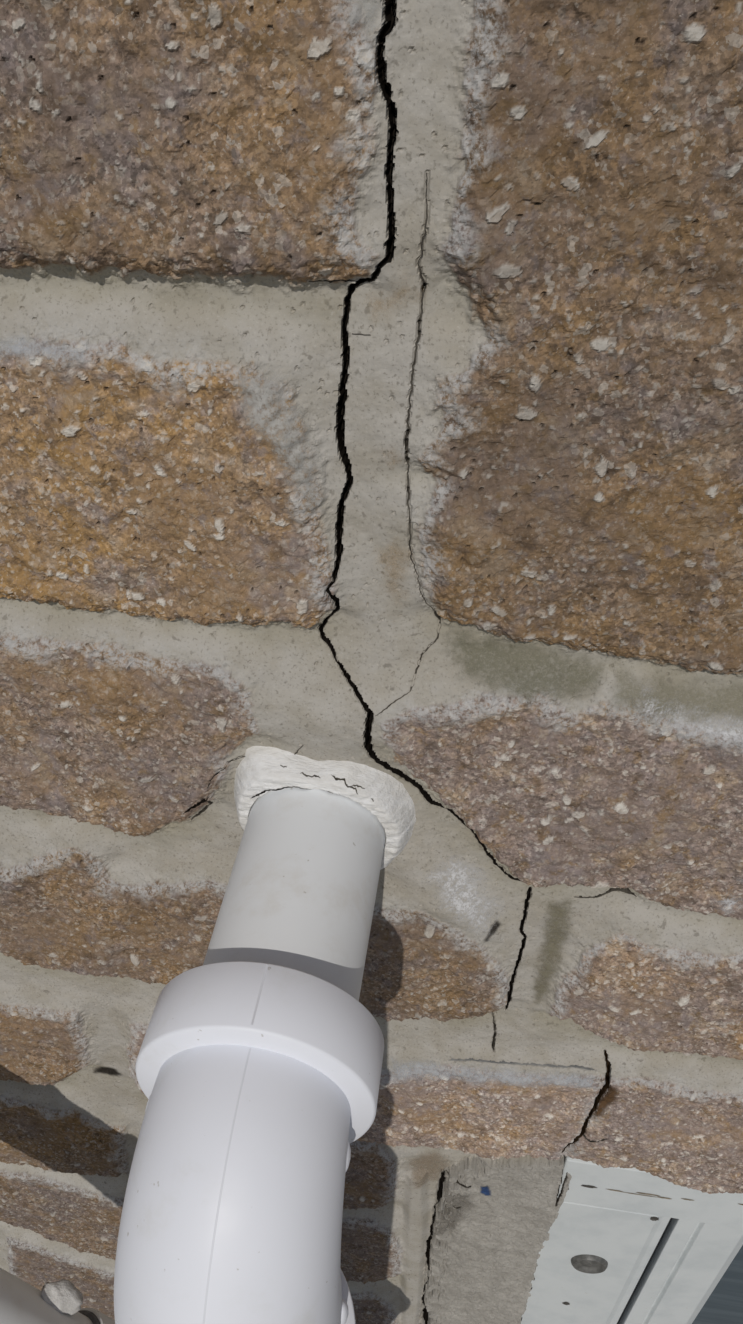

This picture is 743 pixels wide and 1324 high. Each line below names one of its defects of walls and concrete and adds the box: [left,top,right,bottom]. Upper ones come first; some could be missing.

crack [252,0,610,1207]
crack [183,756,245,820]
crack [576,888,637,898]
crack [422,1170,470,1324]